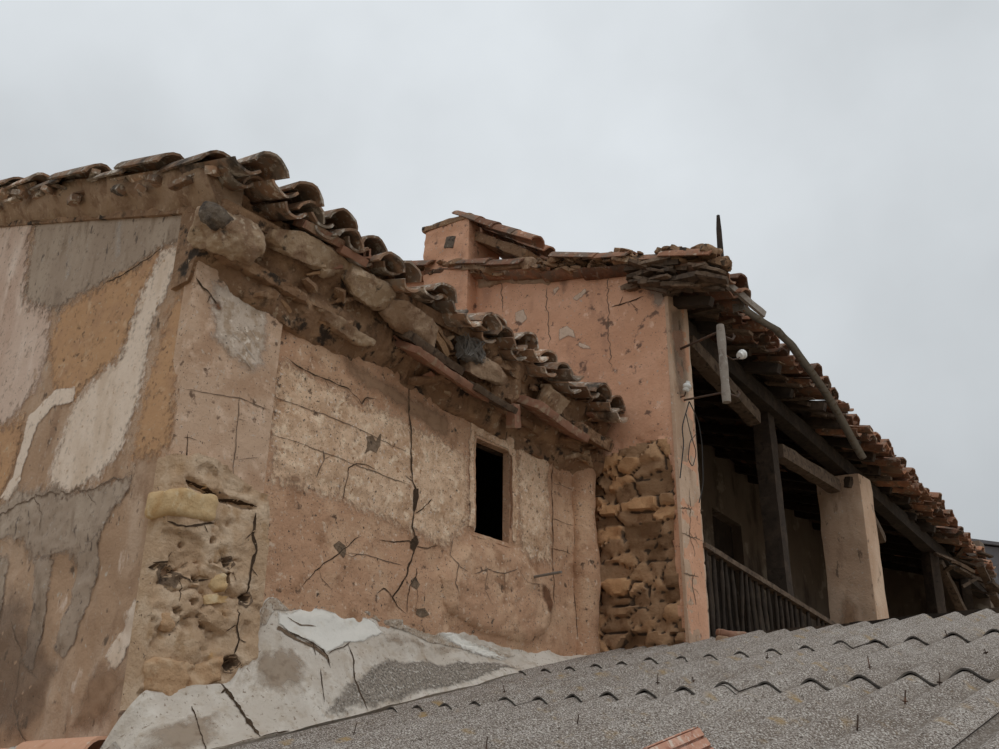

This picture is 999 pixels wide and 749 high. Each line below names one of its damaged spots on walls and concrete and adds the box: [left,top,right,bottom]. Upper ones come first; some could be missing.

flaking render [0,215,182,496]
crack [187,357,578,638]
spalling [148,563,182,588]
crack [153,552,209,601]
crack [168,480,258,654]
spalling [142,656,224,696]
crack [192,684,287,749]
crack [284,617,368,710]